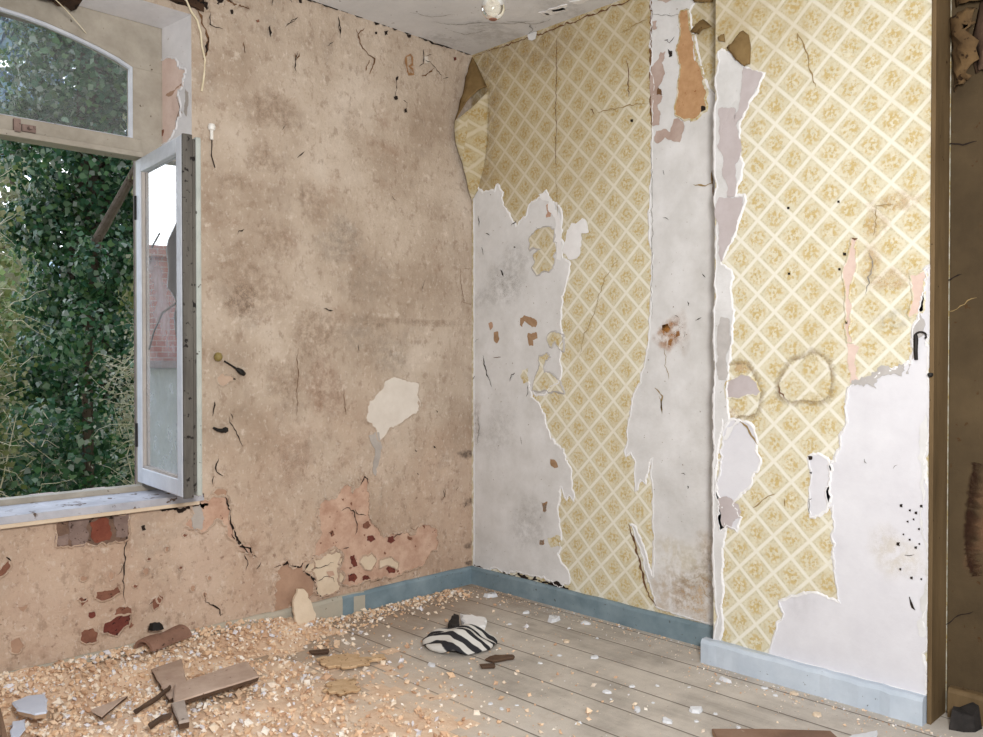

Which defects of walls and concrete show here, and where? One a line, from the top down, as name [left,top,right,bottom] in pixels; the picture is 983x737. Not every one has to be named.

flaking render [161,56,189,145]
peeling [715,67,763,262]
peeling [539,192,588,261]
peeling [716,317,731,380]
spalling [53,513,146,549]
spalling [271,376,439,612]
peeling [718,496,741,529]
spalling [503,571,568,589]